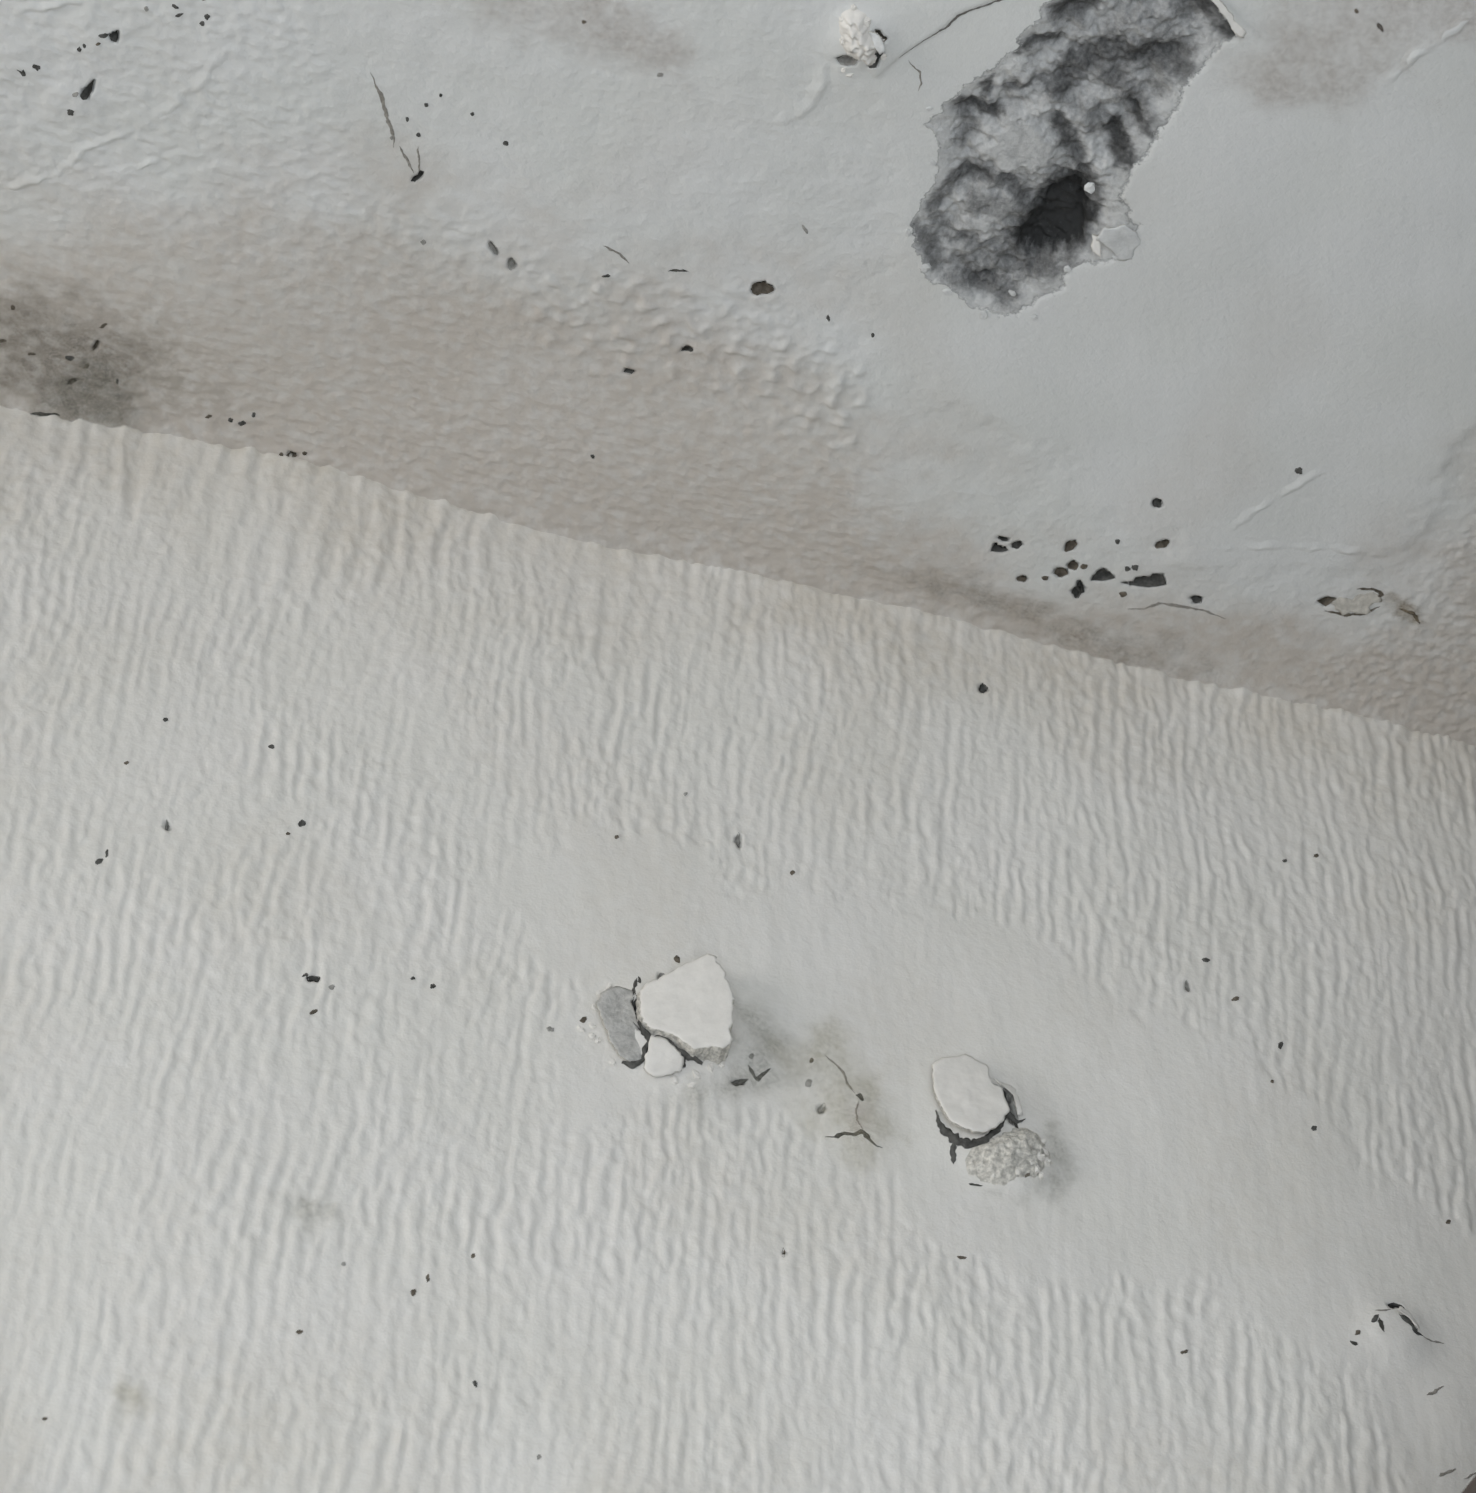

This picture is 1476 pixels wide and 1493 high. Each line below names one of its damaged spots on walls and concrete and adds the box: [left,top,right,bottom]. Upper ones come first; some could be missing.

flaking render [837,0,1002,91]
spalling [904,0,1246,321]
spalling [991,536,1022,552]
spalling [1017,540,1166,598]
crack [805,1055,883,1148]
crack [1350,1303,1444,1345]
crack [1439,1469,1476,1479]